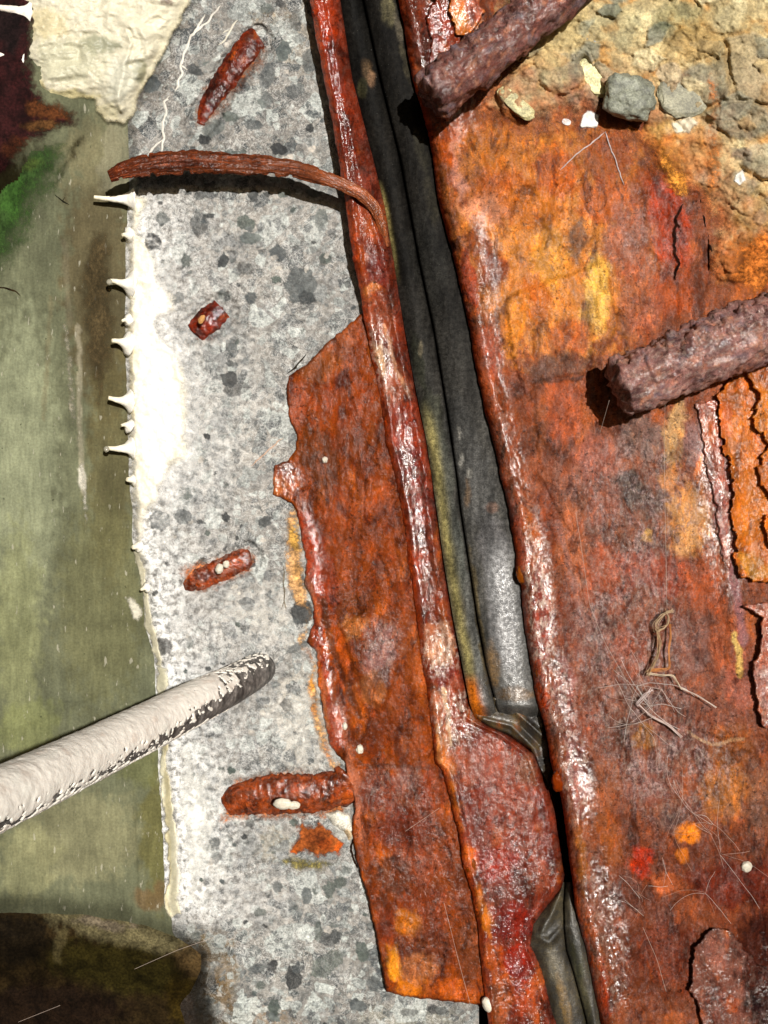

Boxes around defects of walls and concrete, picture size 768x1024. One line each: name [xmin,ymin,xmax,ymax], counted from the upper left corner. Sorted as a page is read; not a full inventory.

corrosion [197,28,264,126]
corrosion [414,0,590,120]
corrosion [107,149,389,247]
crack [673,200,712,280]
corrosion [188,300,229,341]
damp [84,188,205,695]
corrosion [604,233,768,584]
corrosion [183,549,252,591]
corrosion [743,602,768,729]
corrosion [221,666,354,869]
damp [160,744,211,918]
corrosion [688,928,768,1024]